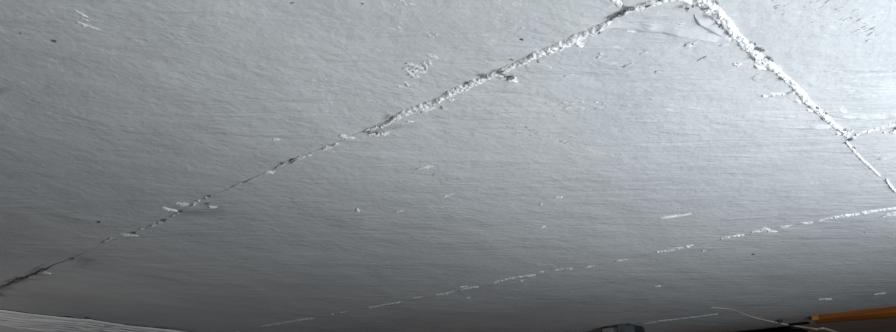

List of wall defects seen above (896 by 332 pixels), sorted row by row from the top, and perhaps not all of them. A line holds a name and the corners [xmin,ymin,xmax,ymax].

crack [96,0,896,248]
crack [0,250,90,291]
crack [0,309,167,329]
crack [236,207,896,332]